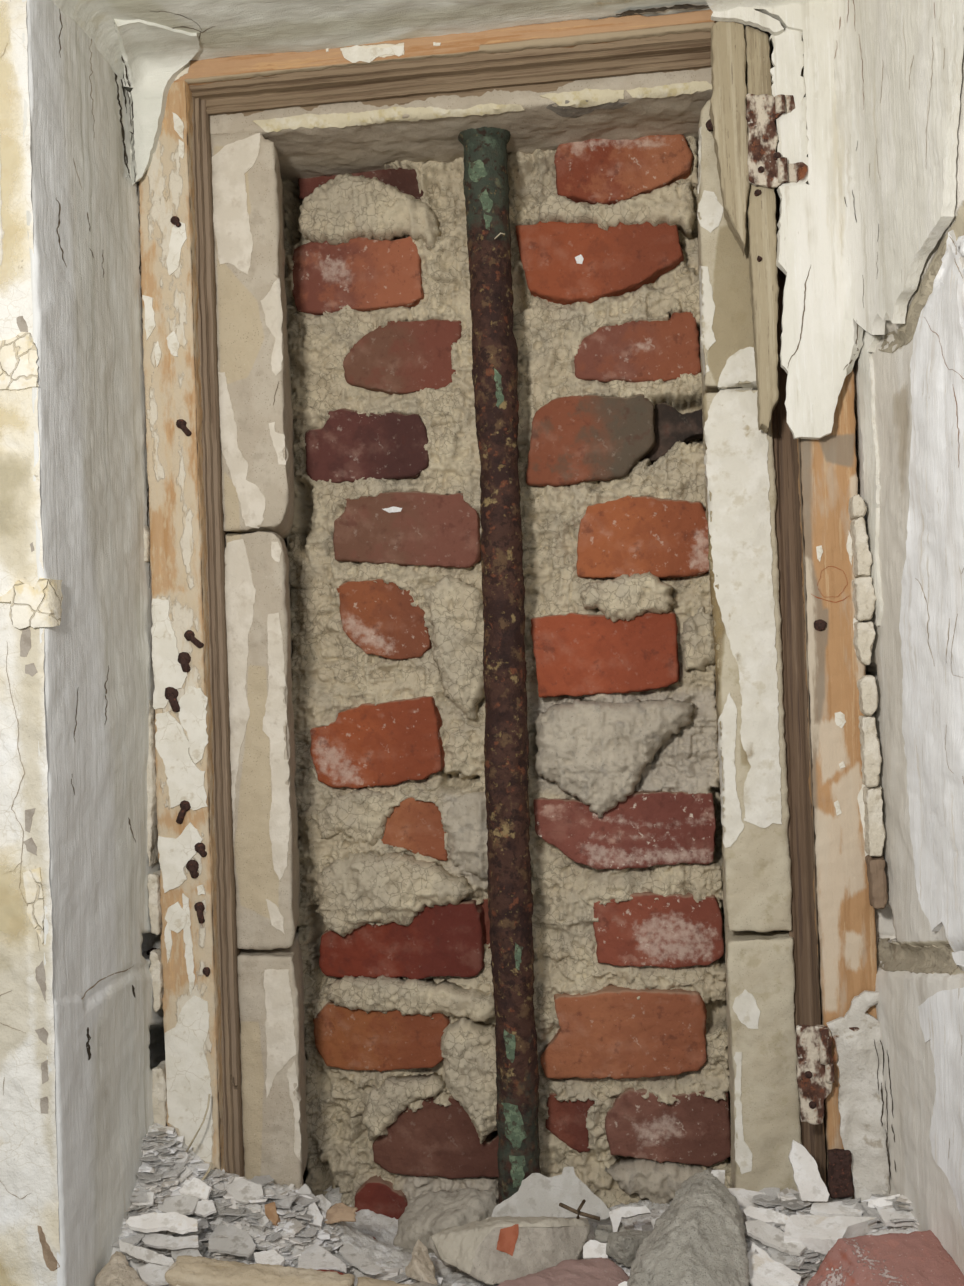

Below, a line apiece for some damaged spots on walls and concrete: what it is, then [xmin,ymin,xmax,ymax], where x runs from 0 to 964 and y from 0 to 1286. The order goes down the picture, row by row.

peeling [326,45,404,63]
crack [834,0,945,148]
peeling [212,103,525,274]
peeling [0,316,39,391]
peeling [142,295,180,367]
peeling [261,274,283,376]
crack [788,266,811,365]
peeling [218,372,290,880]
peeling [697,0,964,1229]
peeling [151,599,213,1162]
peeling [263,969,302,1164]
peeling [743,990,916,1286]